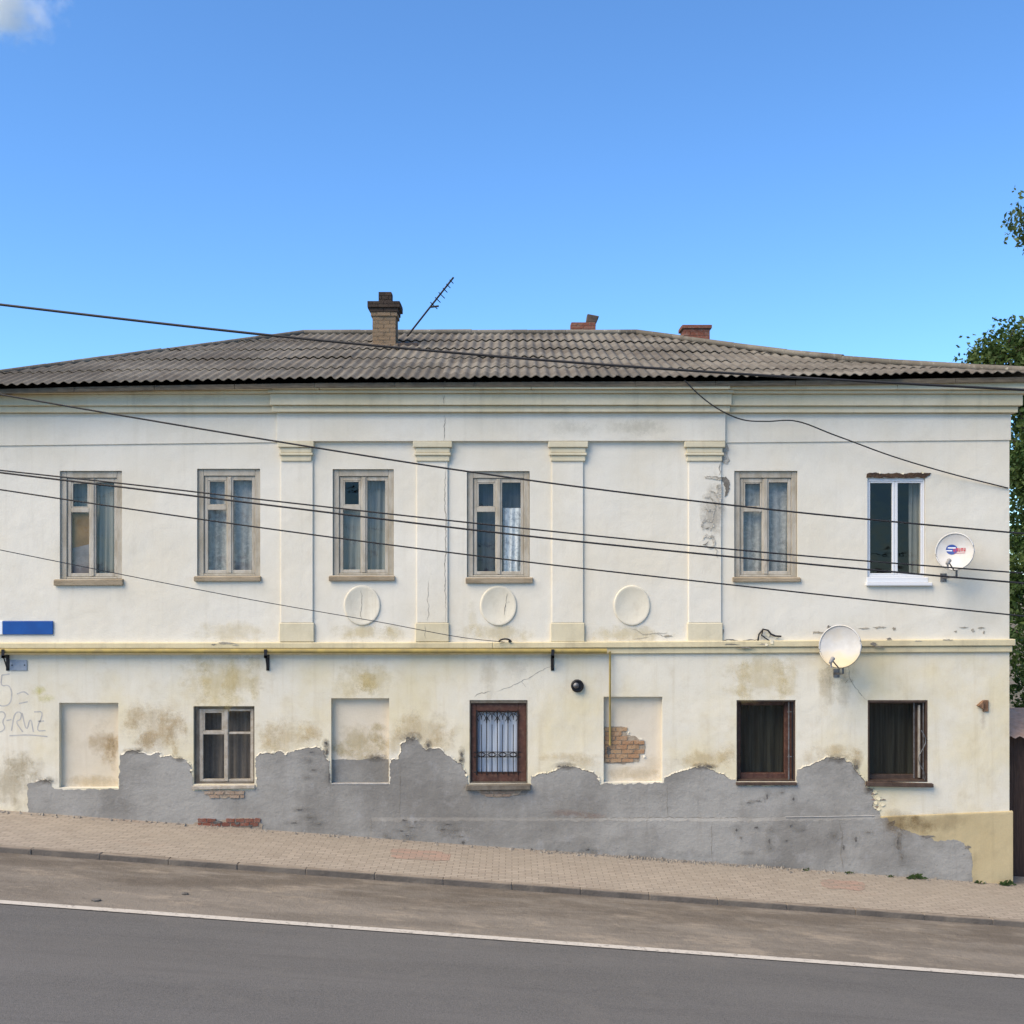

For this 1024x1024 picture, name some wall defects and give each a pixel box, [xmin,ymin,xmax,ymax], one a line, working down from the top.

flaking render [701,444,730,554]
flaking render [604,726,646,764]
flaking render [27,737,973,882]